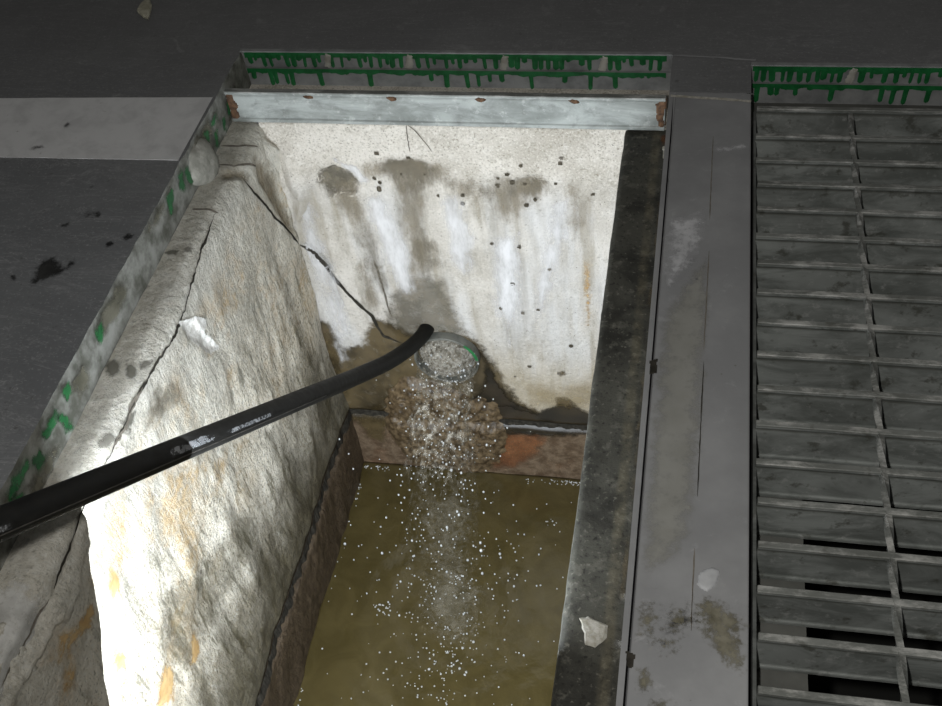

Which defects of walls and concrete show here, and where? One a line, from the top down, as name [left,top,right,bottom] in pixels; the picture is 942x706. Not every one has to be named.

crack [105,208,218,463]
crack [220,144,402,344]
leakage [303,161,591,473]
crack [1,505,85,688]
rust [109,569,120,600]
rust [158,667,174,706]
leakage [661,600,744,666]